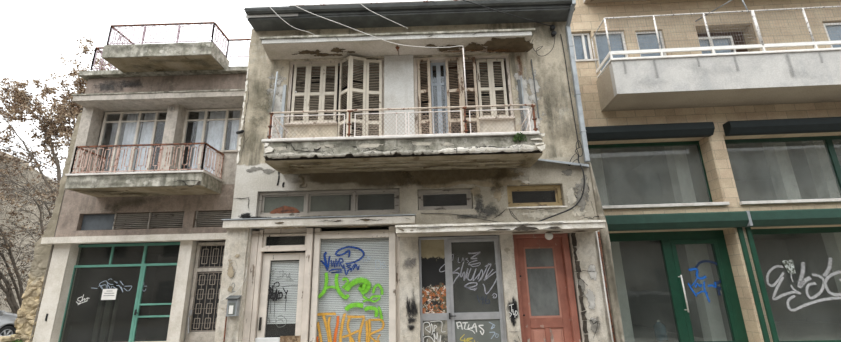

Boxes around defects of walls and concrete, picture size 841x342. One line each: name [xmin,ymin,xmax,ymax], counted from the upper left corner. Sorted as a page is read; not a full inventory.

peeling [291,47,355,57]
peeling [425,37,534,53]
peeling [237,68,249,163]
spalling [264,62,545,202]
spalling [486,210,600,342]